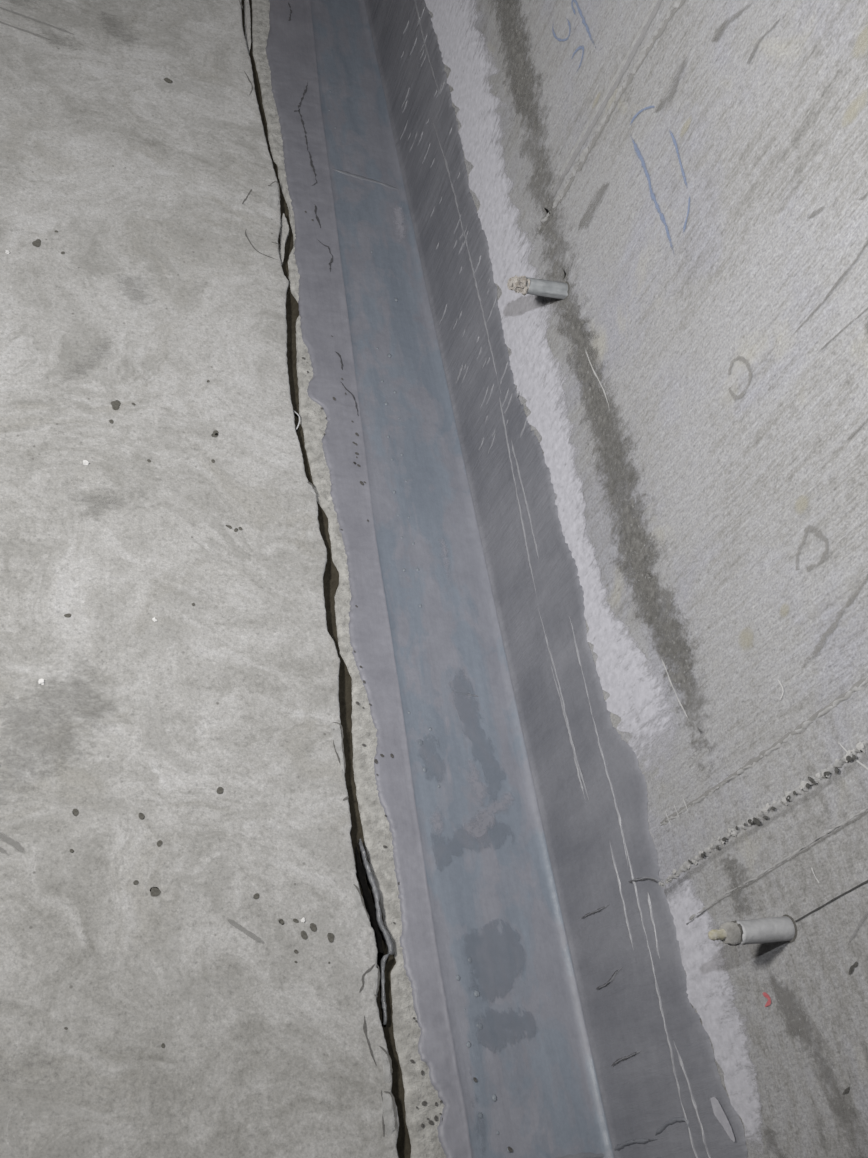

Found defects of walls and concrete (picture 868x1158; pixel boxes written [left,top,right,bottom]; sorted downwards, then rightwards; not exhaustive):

crack [241,0,411,1158]
water stain [424,0,706,775]